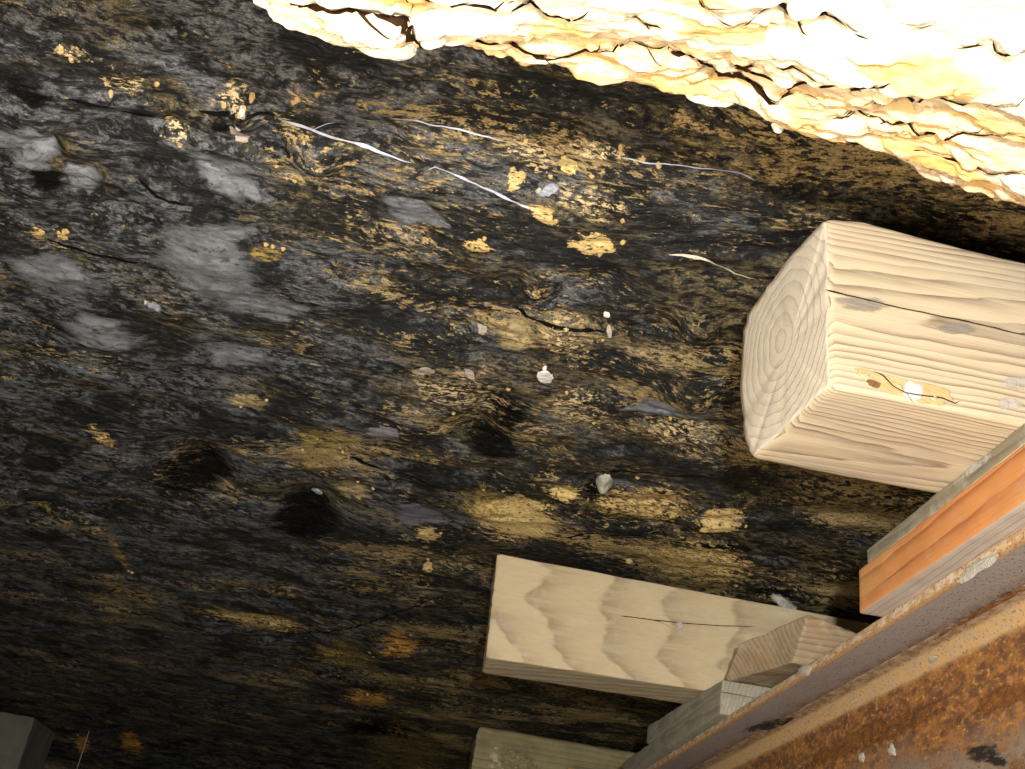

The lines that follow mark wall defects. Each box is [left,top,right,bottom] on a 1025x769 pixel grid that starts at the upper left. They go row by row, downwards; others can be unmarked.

rust [940,587,1024,637]